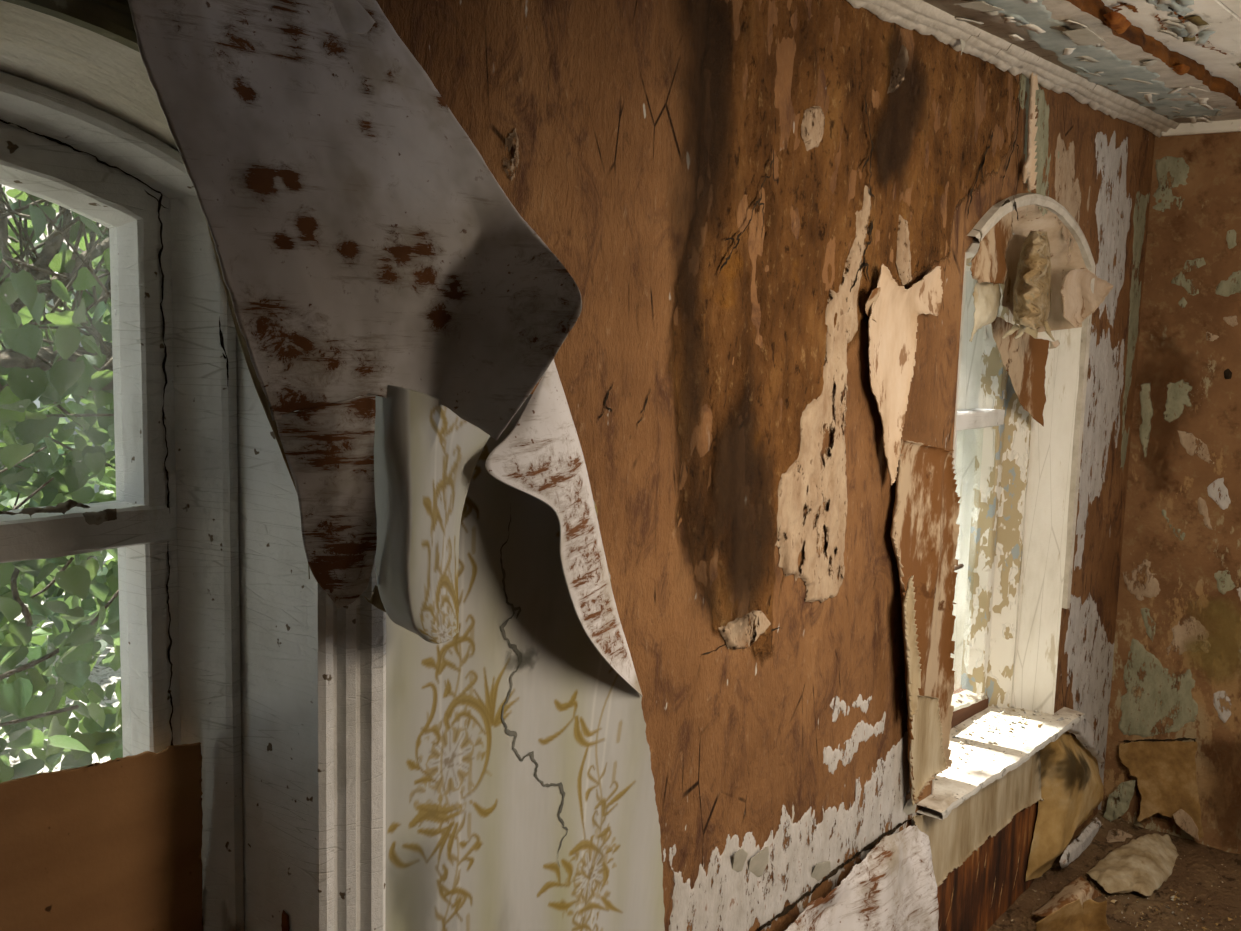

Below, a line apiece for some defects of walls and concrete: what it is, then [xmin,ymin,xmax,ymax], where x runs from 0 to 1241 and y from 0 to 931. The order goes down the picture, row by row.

leakage [681,0,731,443]
spalling [669,0,1231,661]
crack [500,503,568,866]
leakage [714,395,772,618]
peeling [663,731,918,931]
peeling [823,694,886,774]
peeling [1064,559,1211,783]
peeling [1213,691,1231,723]
peeling [1214,570,1241,600]